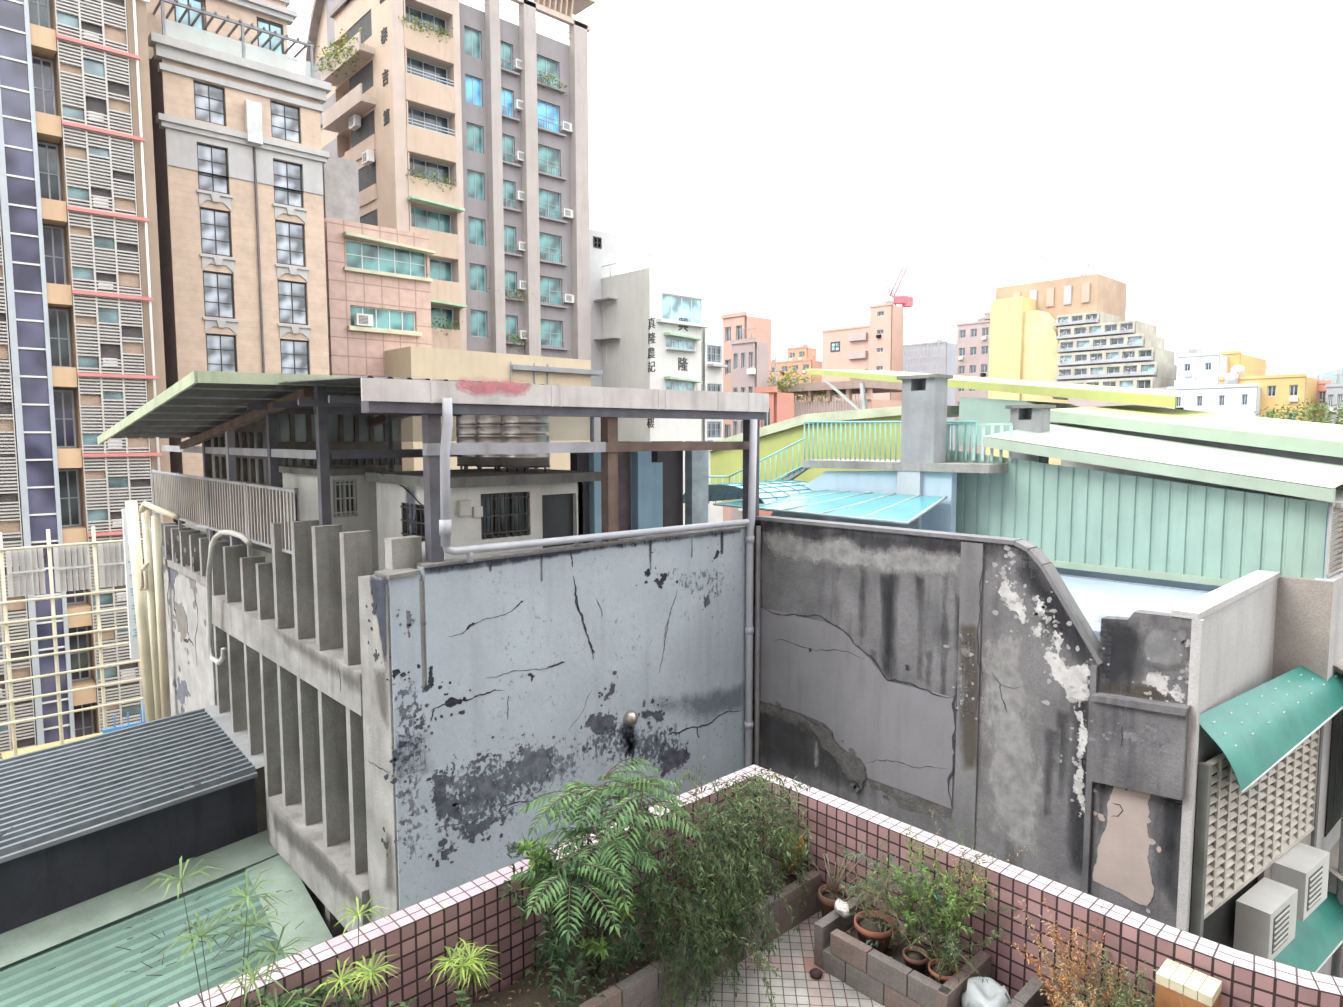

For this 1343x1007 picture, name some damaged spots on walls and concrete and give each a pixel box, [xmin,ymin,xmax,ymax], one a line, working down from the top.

peeling [366,591,471,784]
peeling [426,734,558,867]
crack [430,550,603,721]
damp [383,678,692,863]
damp [422,520,961,676]
crack [666,710,742,738]
crack [760,546,1018,806]
damp [957,609,1047,858]
peeling [985,545,1170,913]
damp [1070,699,1089,869]
damp [1020,551,1171,699]
peeling [1132,614,1191,703]